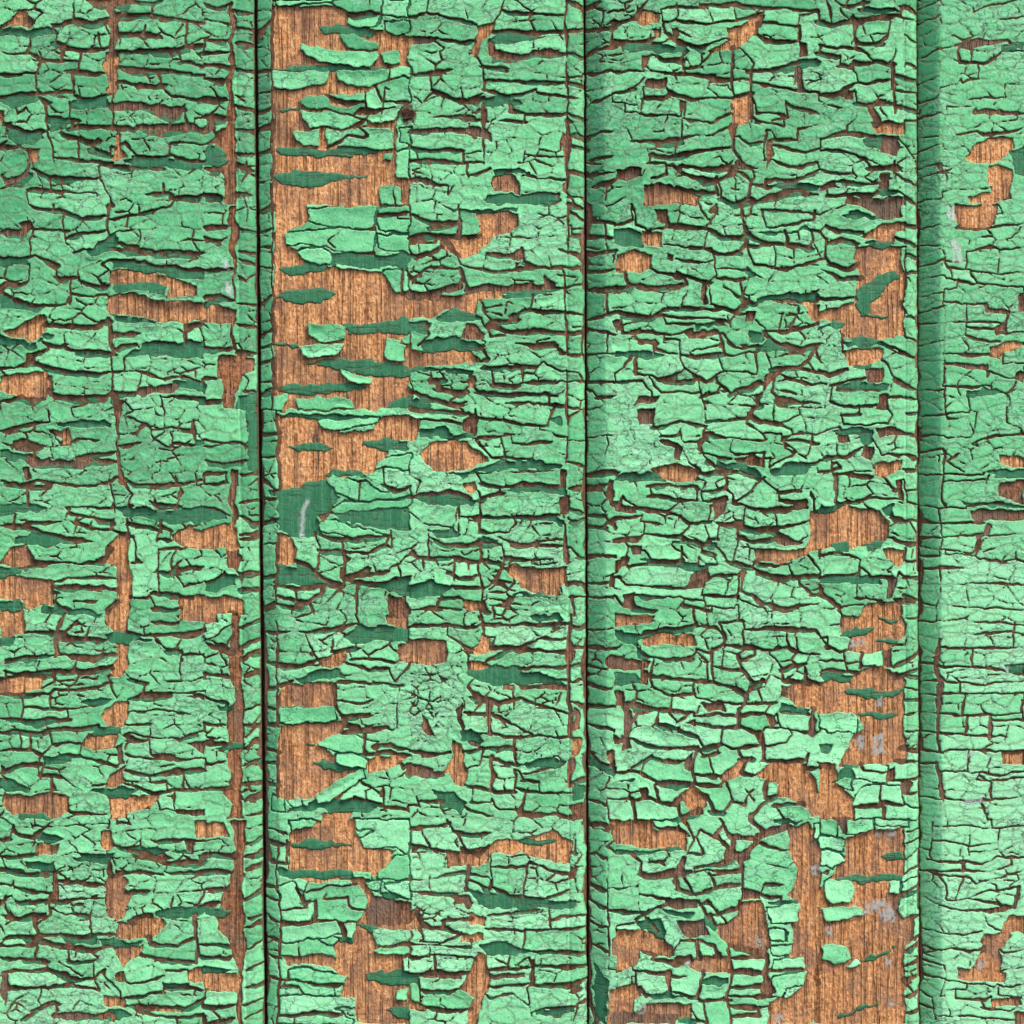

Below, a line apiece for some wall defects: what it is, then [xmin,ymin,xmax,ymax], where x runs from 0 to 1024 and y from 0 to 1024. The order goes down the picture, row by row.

crack [956,84,1024,139]
crack [171,319,257,357]
peeling [0,0,264,1024]
crack [381,466,473,505]
peeling [257,0,1024,1024]
crack [947,570,1024,611]
crack [891,616,1024,841]
crack [853,783,906,820]
crack [124,913,235,985]
crack [416,982,474,1024]
crack [609,938,804,1024]
crack [898,828,1024,1024]